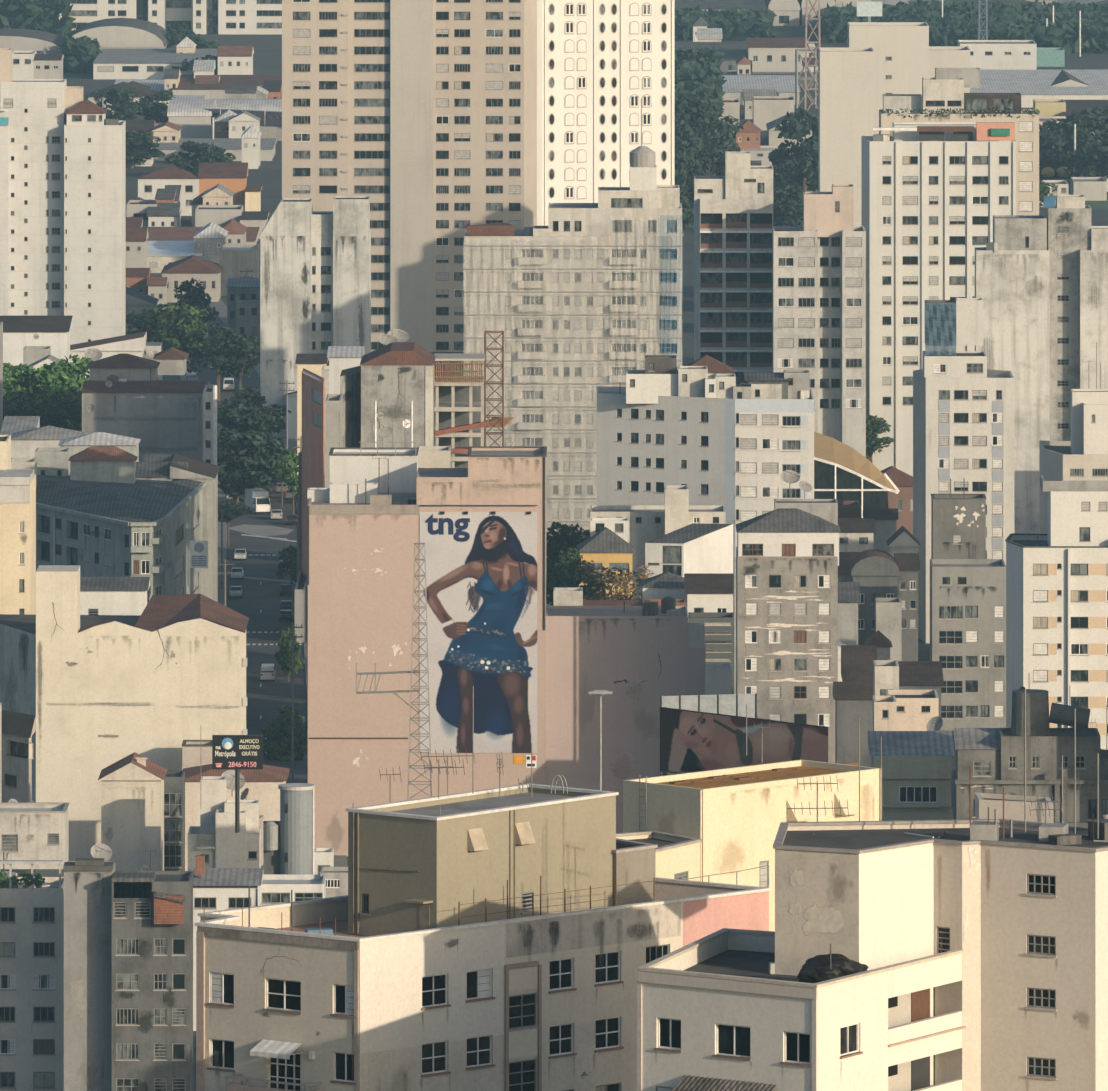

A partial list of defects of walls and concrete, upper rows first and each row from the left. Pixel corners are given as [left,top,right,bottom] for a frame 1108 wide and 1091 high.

flaking render [953,504,985,528]